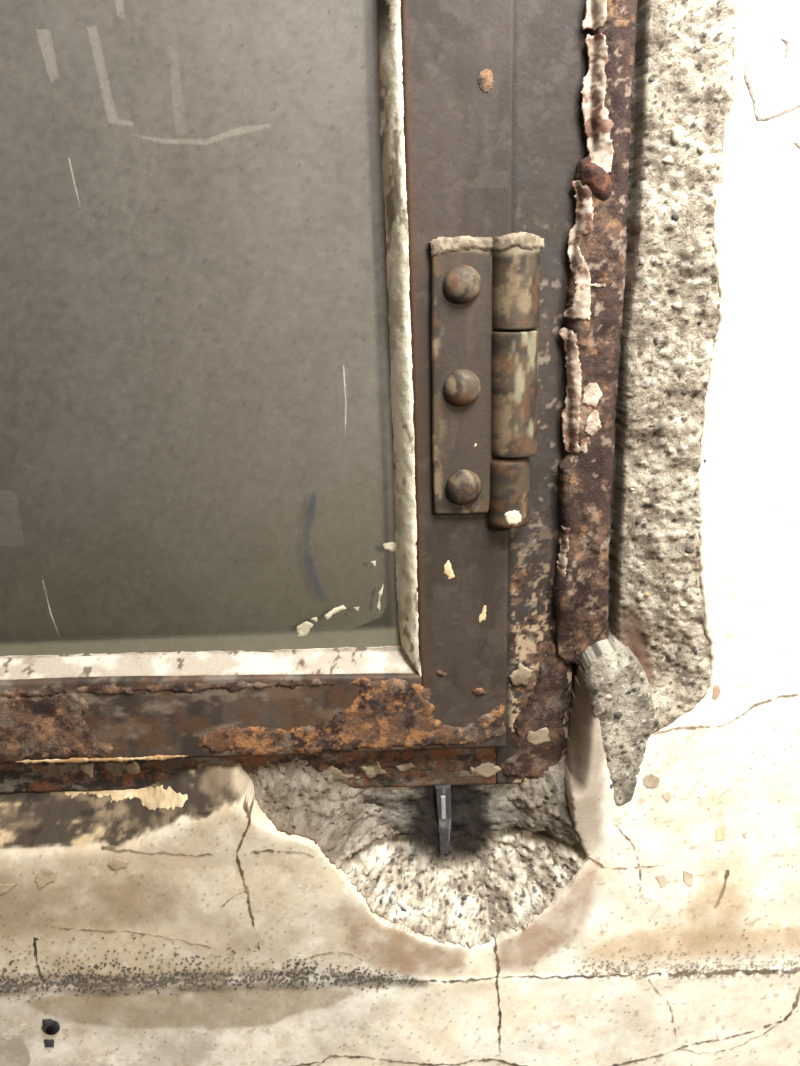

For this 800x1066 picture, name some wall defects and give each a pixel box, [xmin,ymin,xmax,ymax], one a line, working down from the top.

peeling [558,180,606,454]
spalling [580,0,800,806]
rust [0,678,337,785]
rust [196,643,569,780]
peeling [527,727,550,745]
crack [653,694,798,734]
crack [220,797,289,949]
spalling [248,757,585,948]
water stain [0,918,463,1026]
crack [241,938,800,1066]
water stain [580,951,656,979]
water stain [669,929,800,978]